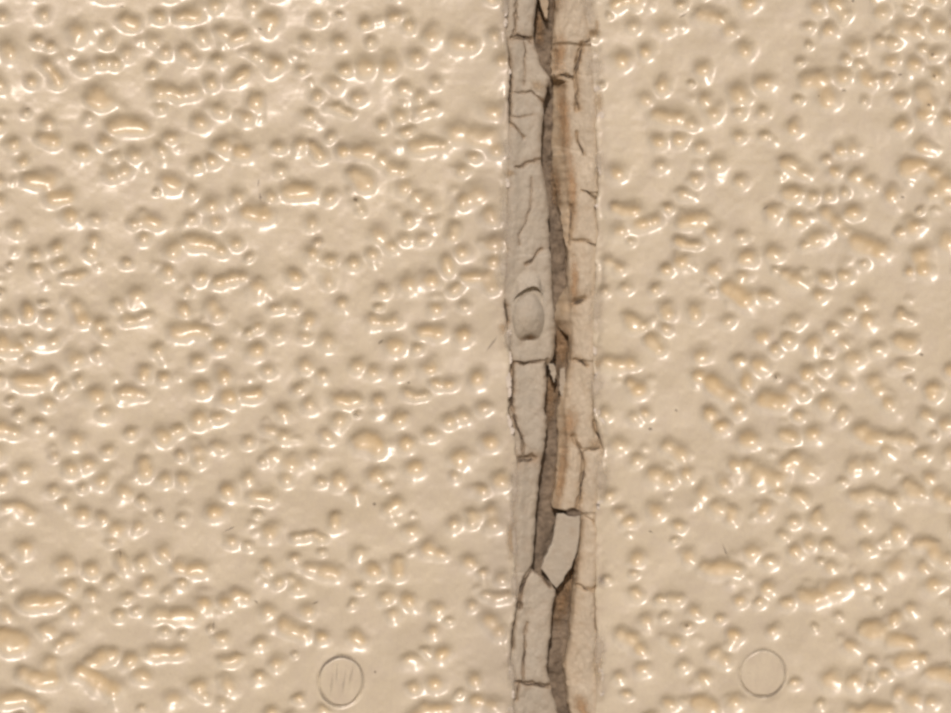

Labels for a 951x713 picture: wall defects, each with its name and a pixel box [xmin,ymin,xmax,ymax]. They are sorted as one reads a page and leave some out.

crack [509,0,600,713]